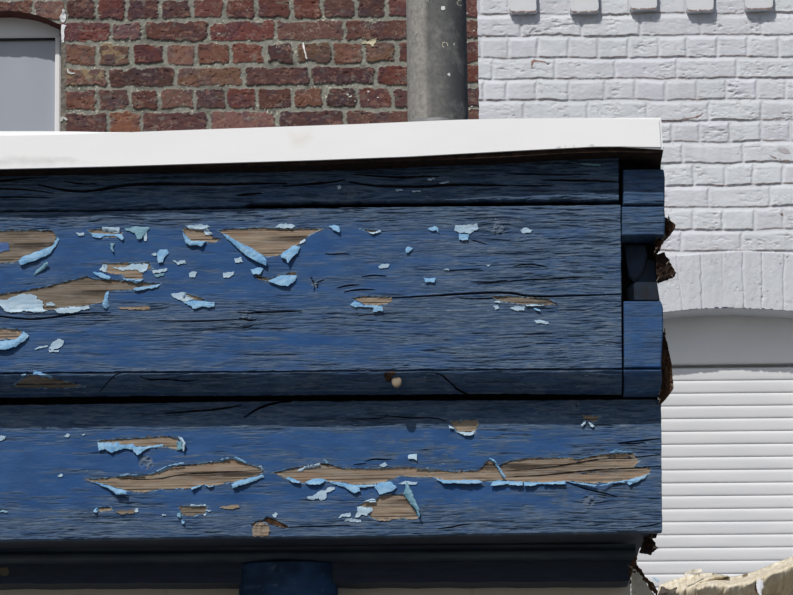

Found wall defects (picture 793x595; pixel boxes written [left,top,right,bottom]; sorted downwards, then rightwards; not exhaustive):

peeling [0,230,59,275]
peeling [76,226,149,252]
peeling [182,223,340,286]
peeling [454,223,478,240]
peeling [0,249,185,313]
peeling [171,292,215,309]
peeling [492,295,558,324]
peeling [0,328,29,350]
peeling [35,339,64,352]
peeling [97,436,185,455]
peeling [86,456,264,495]
peeling [274,449,650,522]